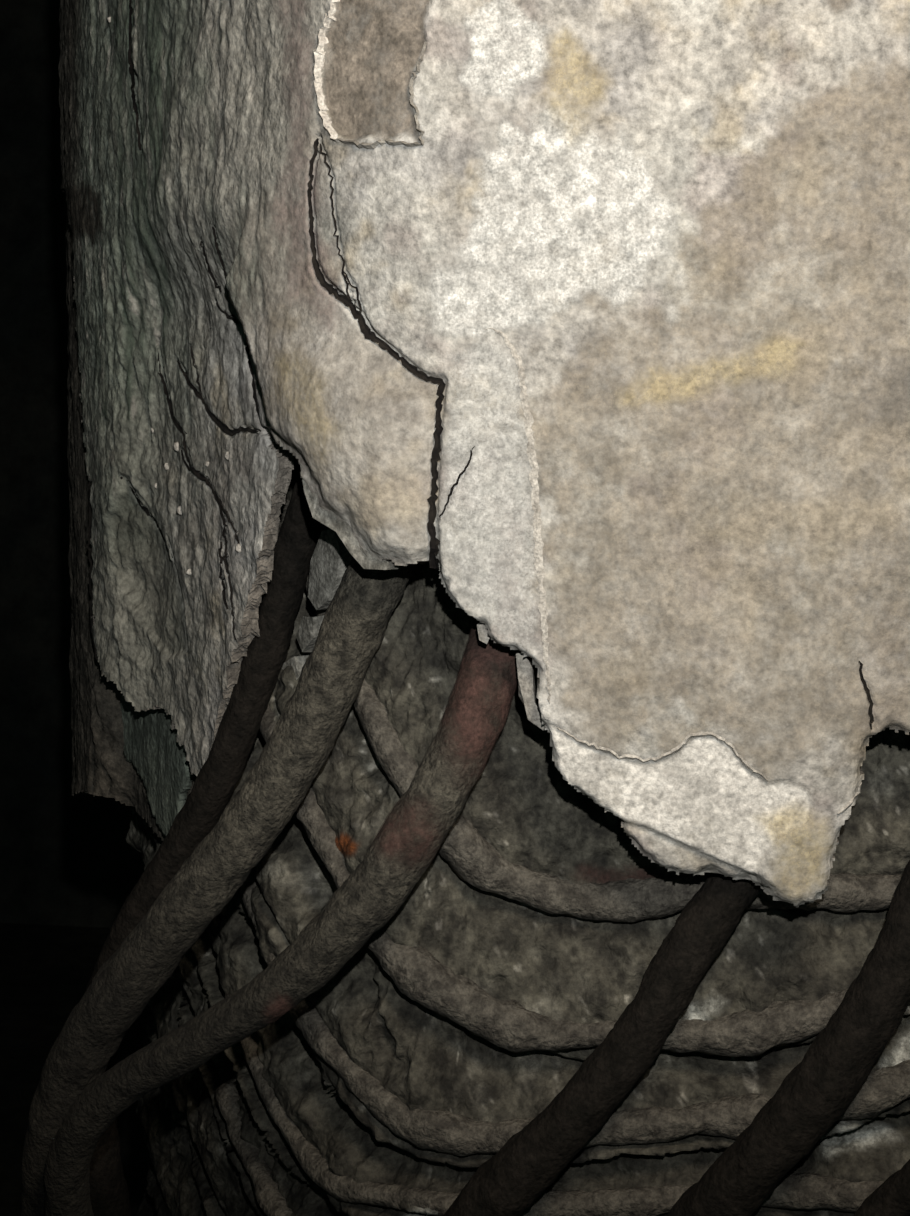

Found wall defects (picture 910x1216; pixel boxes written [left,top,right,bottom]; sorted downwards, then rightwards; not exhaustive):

peeling [312,0,429,149]
crack [86,482,98,660]
crack [120,477,173,558]
crack [157,226,259,640]
spalling [207,428,490,767]
crack [307,138,475,570]
spalling [143,814,337,1047]
spalling [384,851,682,1024]
spalling [461,650,889,1021]
spalling [827,727,910,886]
spalling [136,1012,496,1216]
spalling [786,1098,910,1182]